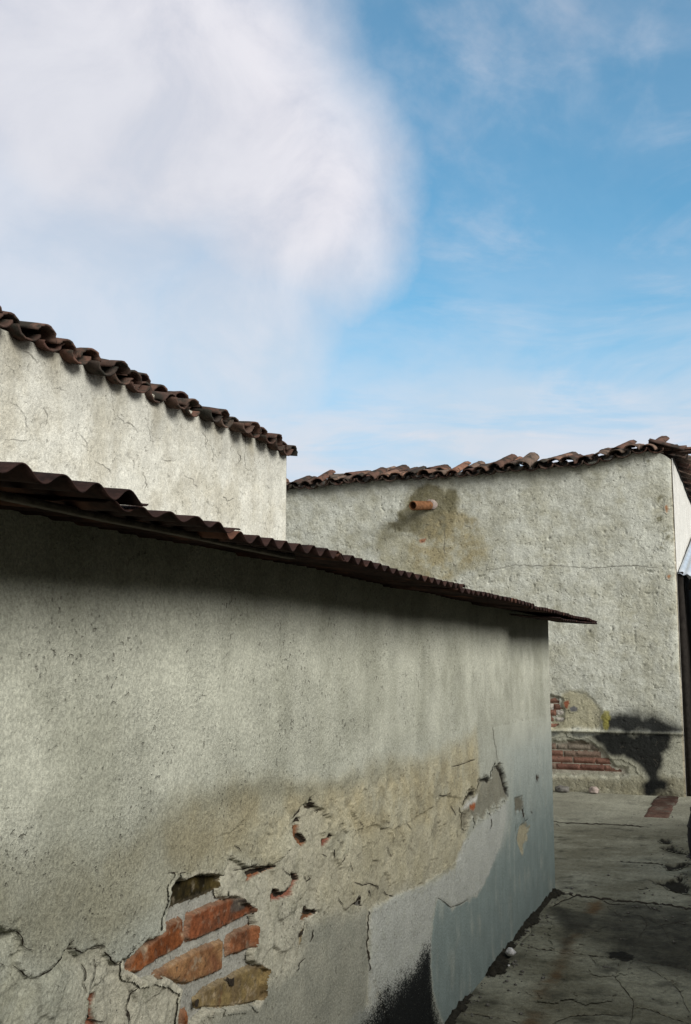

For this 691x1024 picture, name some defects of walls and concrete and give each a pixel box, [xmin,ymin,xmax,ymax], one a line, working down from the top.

damp [372,480,495,583]
spalling [550,687,629,776]
spalling [292,798,316,847]
crack [9,928,139,1022]
spalling [120,865,276,1024]
peeling [348,761,531,979]
crack [520,945,690,1024]
crack [553,861,691,937]